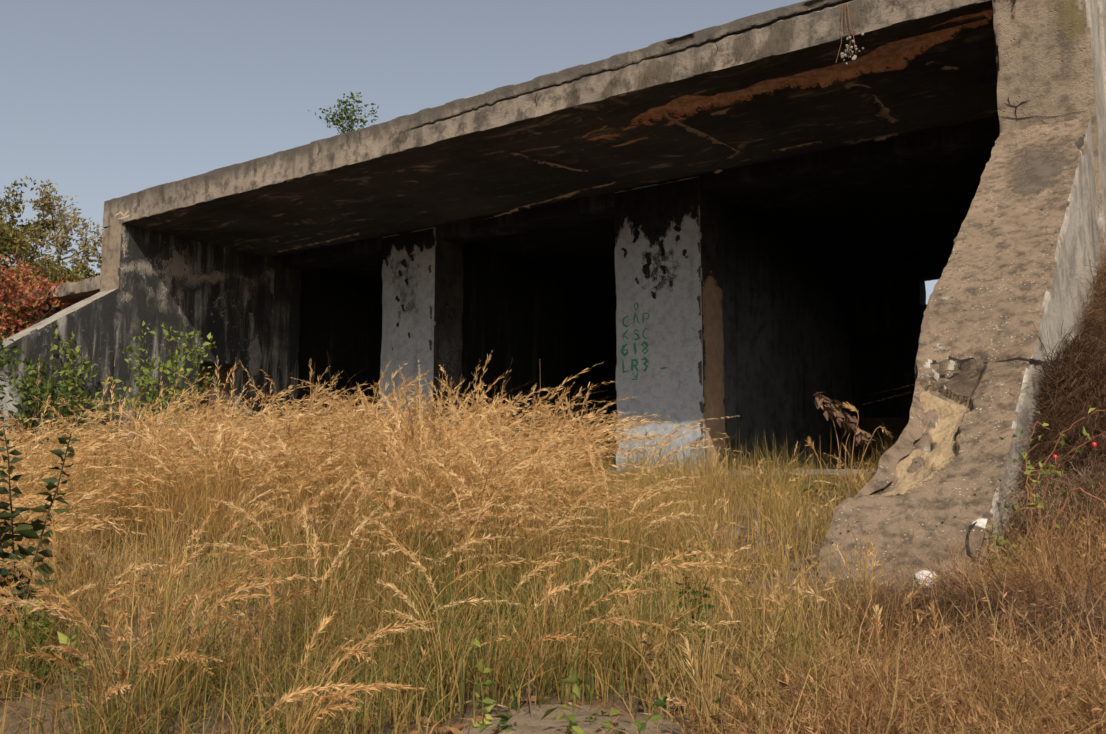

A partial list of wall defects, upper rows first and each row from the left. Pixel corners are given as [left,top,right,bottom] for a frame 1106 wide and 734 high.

crack [411,0,852,130]
crack [1001,97,1084,124]
peeling [635,217,700,286]
peeling [687,266,726,470]
spalling [859,343,988,498]
crack [916,356,1060,380]